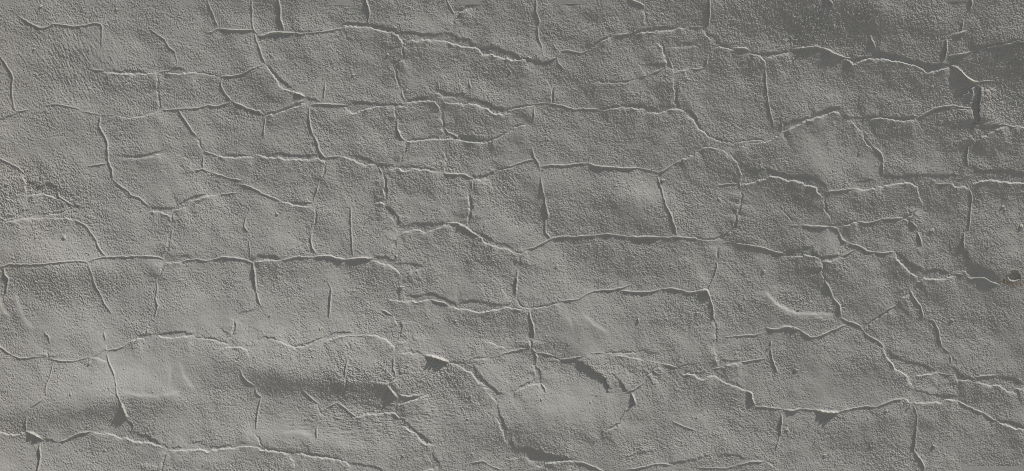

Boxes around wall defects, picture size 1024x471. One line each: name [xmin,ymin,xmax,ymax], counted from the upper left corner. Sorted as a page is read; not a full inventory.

crack [0,415,28,437]
crack [0,308,422,409]
crack [35,368,442,471]
crack [0,0,1024,320]
crack [238,79,923,471]
crack [707,182,1024,471]